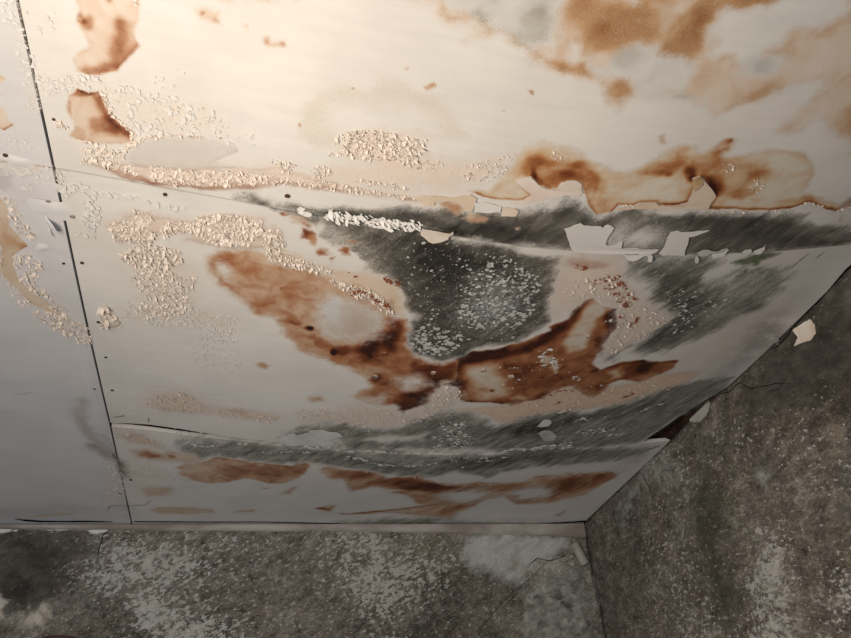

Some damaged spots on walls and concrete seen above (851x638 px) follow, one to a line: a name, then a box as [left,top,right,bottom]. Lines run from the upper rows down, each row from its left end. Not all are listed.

corrosion [71,0,141,77]
corrosion [54,87,137,149]
peeling [50,165,413,345]
peeling [77,121,583,217]
peeling [297,207,453,244]
corrosion [202,246,679,414]
leakage [172,272,851,480]
leakage [229,188,851,365]
peeling [541,223,710,360]
corrosion [438,134,851,224]
corrosion [114,428,619,518]
leakage [0,529,100,628]